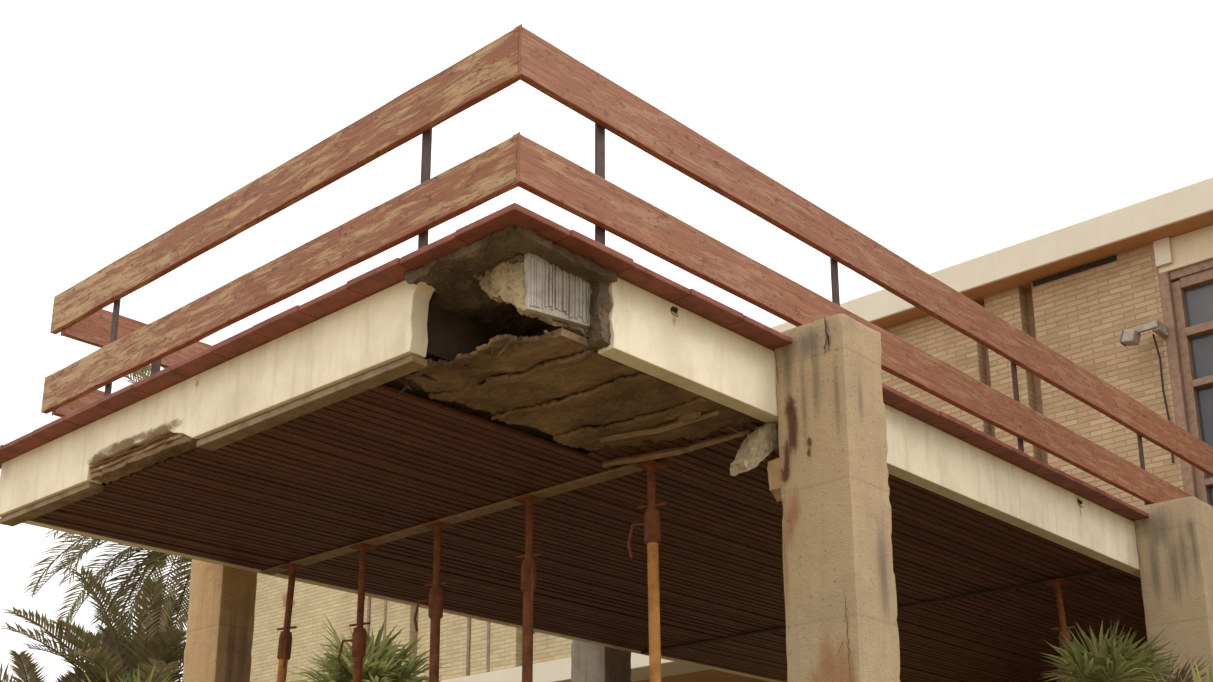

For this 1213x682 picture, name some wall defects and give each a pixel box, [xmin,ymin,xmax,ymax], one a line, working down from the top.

spalling [391,225,766,468]
spalling [89,433,200,484]
corrosion [780,396,812,482]